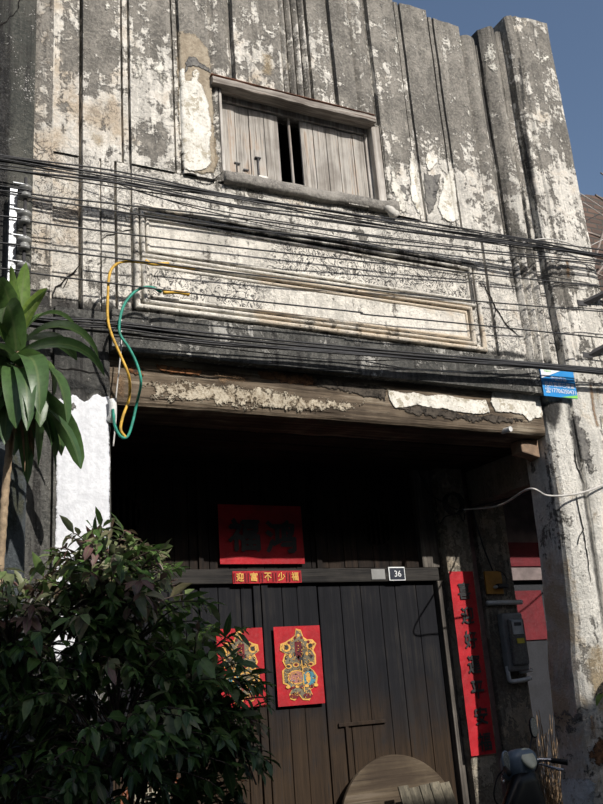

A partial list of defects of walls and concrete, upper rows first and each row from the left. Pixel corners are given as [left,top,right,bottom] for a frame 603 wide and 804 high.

peeling [131,31,219,174]
peeling [390,151,459,222]
damp [497,181,518,301]
damp [519,58,536,239]
crack [482,282,521,338]
spalling [128,364,543,423]
crack [574,450,591,579]